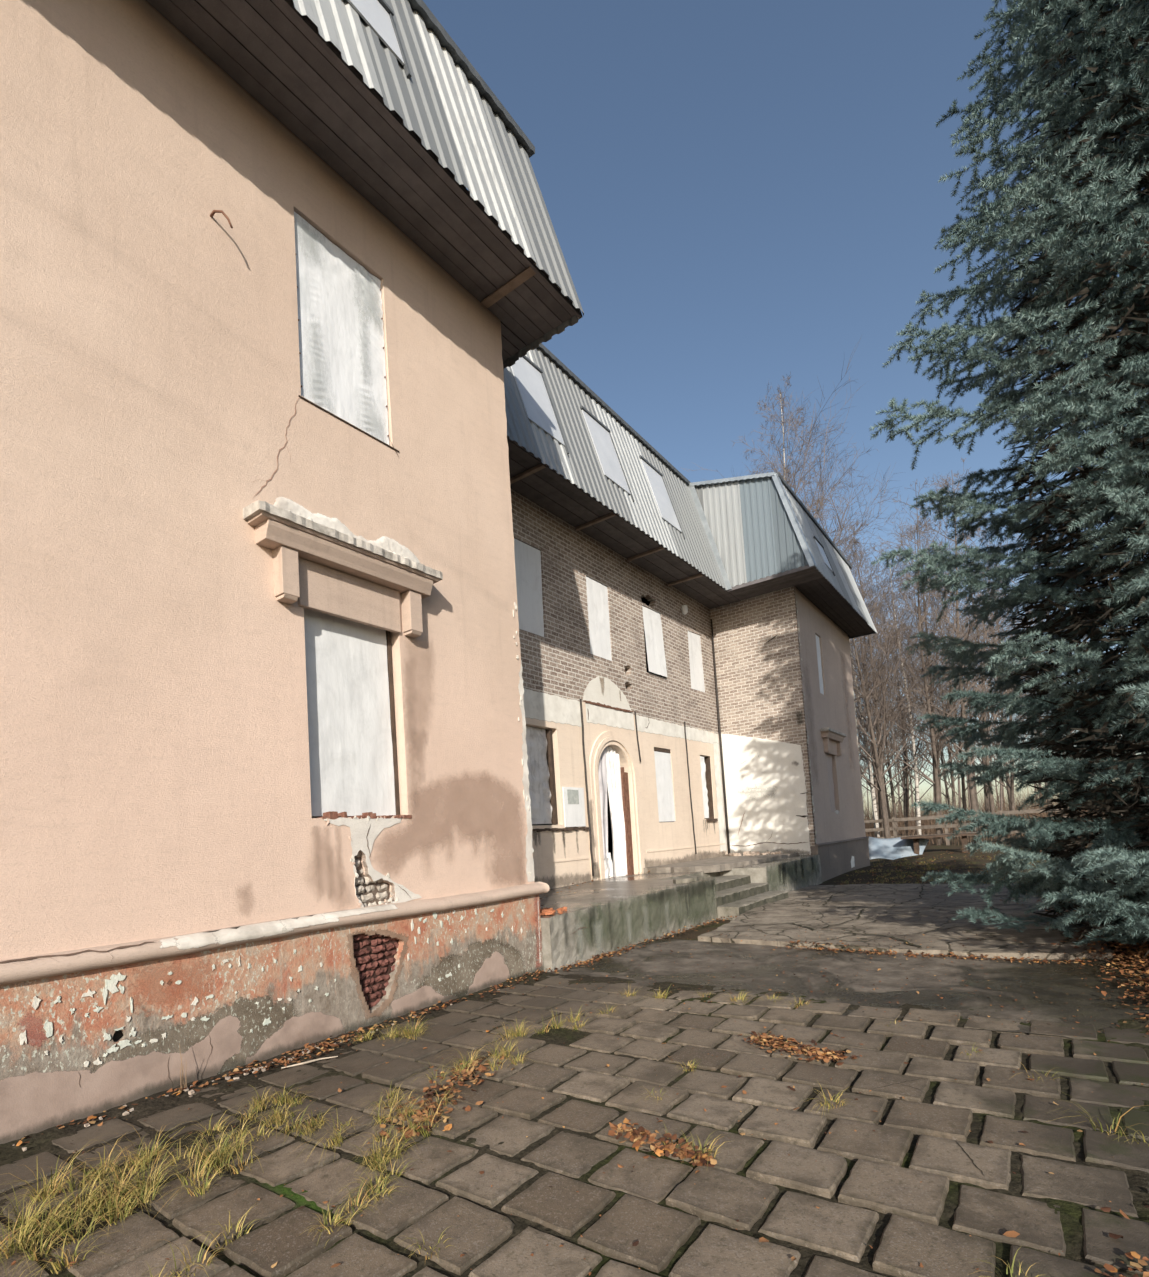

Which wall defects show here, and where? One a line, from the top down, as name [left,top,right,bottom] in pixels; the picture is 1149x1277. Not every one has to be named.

crack [253,398,299,498]
damp [384,777,599,888]
peeling [18,816,422,1074]
spalling [347,908,525,1020]